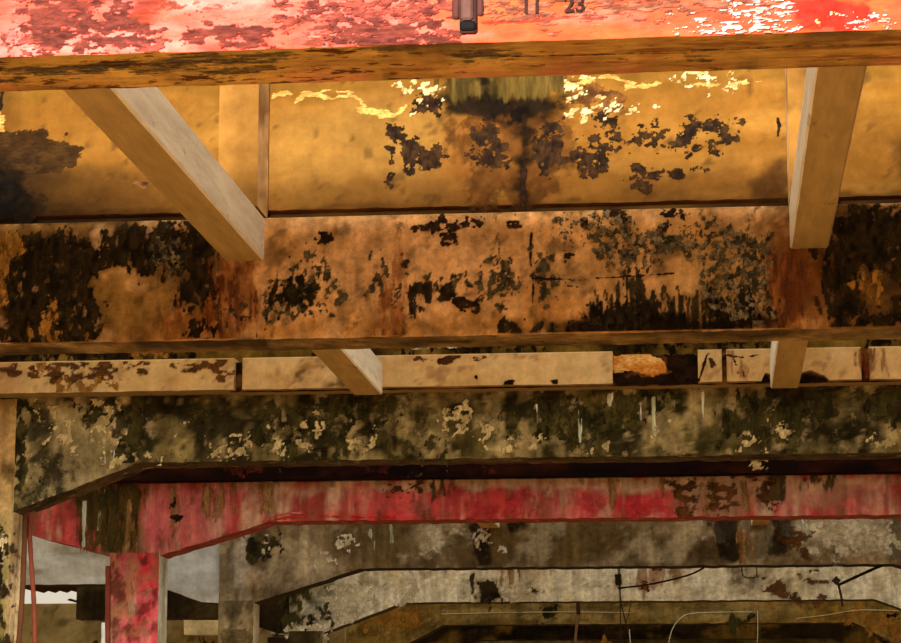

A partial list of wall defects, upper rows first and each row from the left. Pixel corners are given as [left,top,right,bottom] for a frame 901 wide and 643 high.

peeling [0,0,465,57]
peeling [481,0,803,35]
peeling [839,11,897,30]
peeling [271,89,407,119]
water stain [384,50,761,211]
water stain [0,129,349,343]
water stain [568,264,781,332]
spalling [613,353,716,385]
water stain [0,352,235,470]
water stain [207,424,289,462]
water stain [295,410,326,453]
water stain [436,399,546,456]